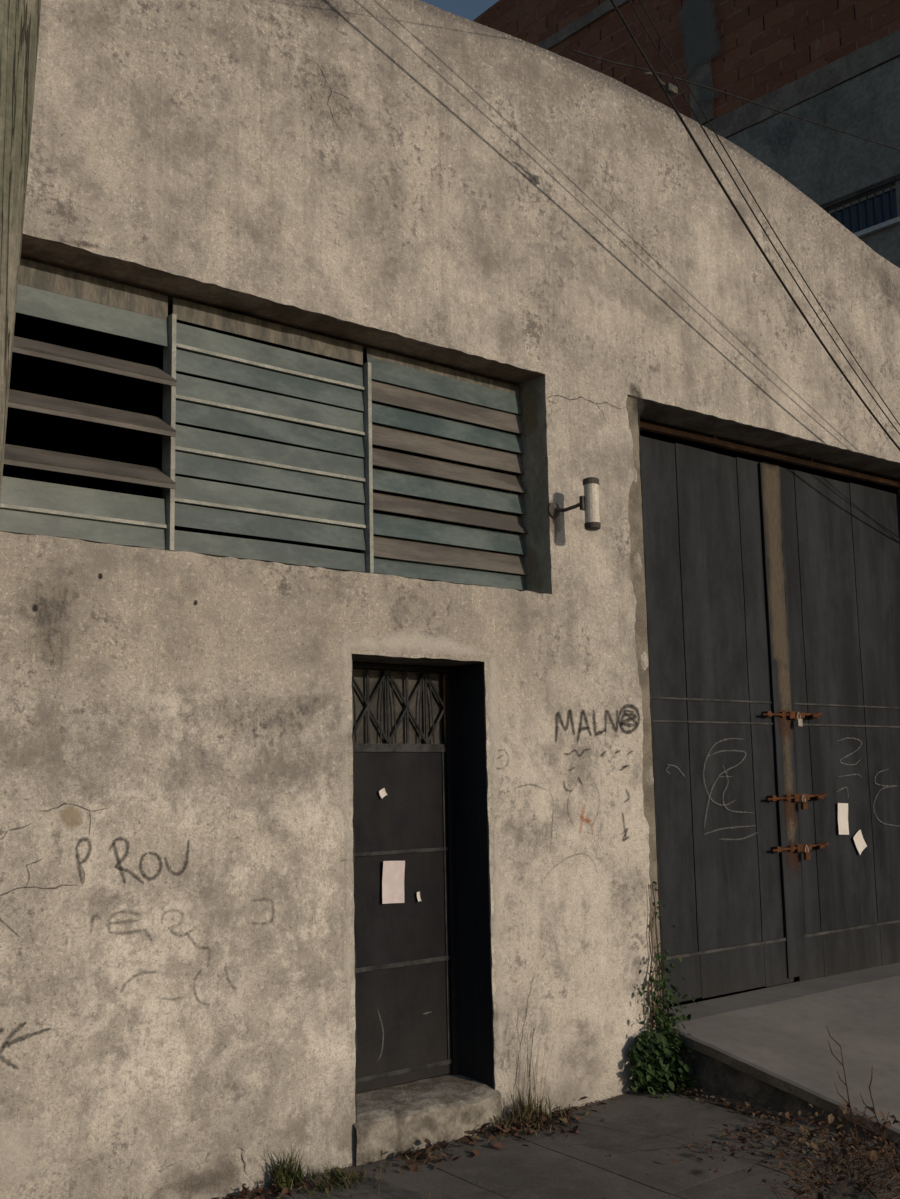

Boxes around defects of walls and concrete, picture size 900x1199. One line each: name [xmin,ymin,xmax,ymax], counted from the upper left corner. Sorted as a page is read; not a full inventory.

crack [0,859,85,939]